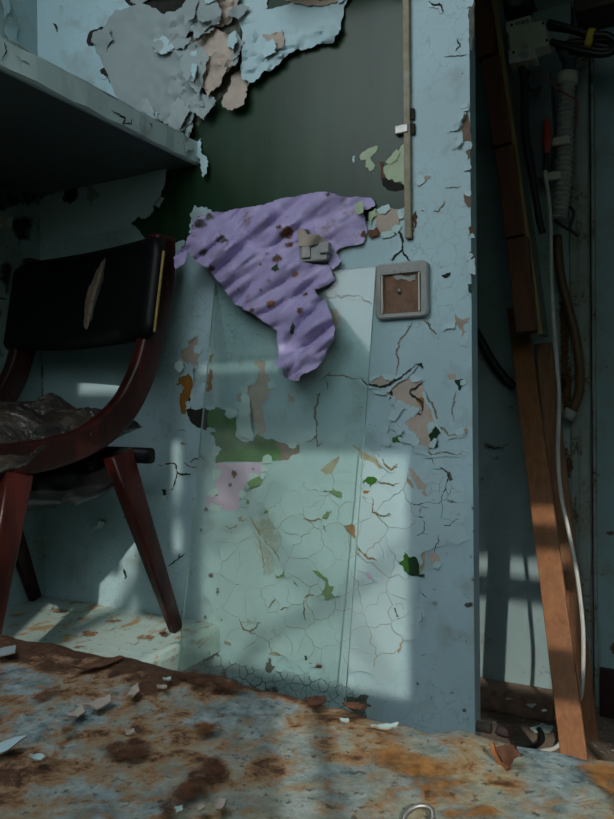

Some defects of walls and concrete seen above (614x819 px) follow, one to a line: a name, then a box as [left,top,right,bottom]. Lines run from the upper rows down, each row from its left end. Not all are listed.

peeling [43,0,418,512]
crack [168,321,469,716]
peeling [369,373,443,452]
peeling [447,103,472,171]